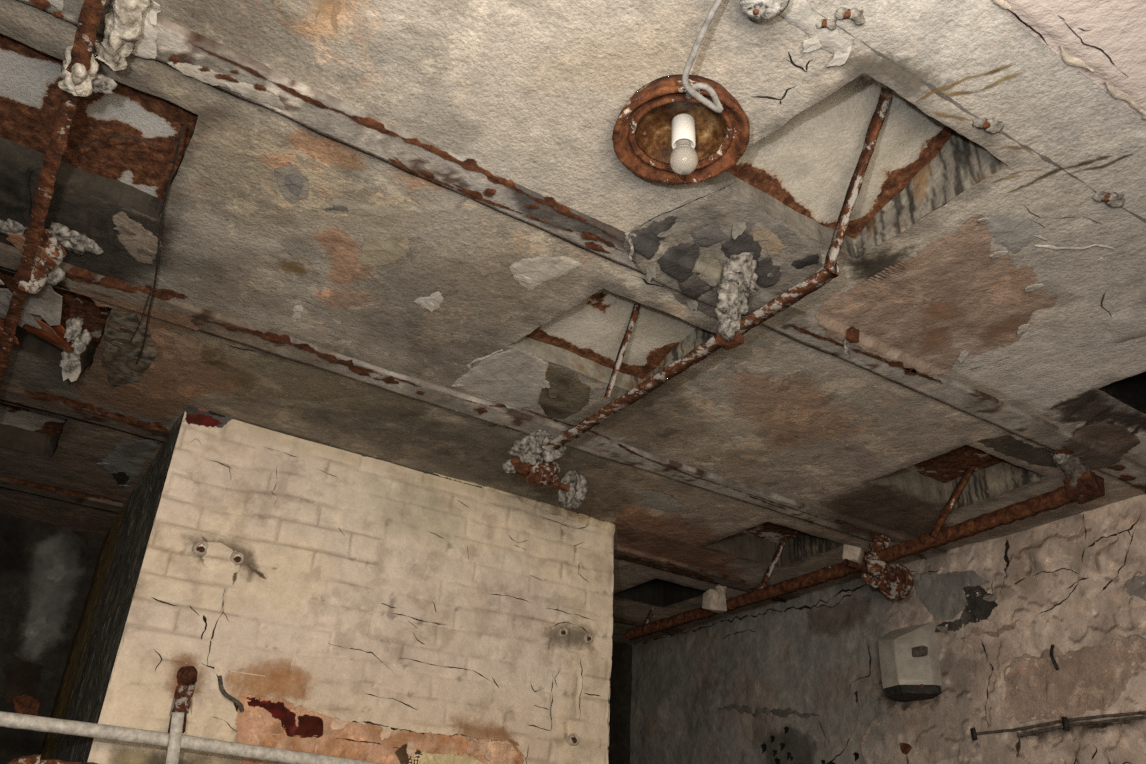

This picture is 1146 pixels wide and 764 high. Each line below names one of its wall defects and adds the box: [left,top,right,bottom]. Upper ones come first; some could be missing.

rust [30,0,64,18]
rust [191,43,623,254]
rust [65,268,189,300]
spalling [623,186,823,319]
rust [789,324,944,384]
crack [152,590,229,678]
crack [329,601,499,687]
flaking render [912,570,998,633]
crack [991,514,1141,618]
spalling [235,692,524,764]
crack [336,693,500,756]
damp [761,727,835,764]